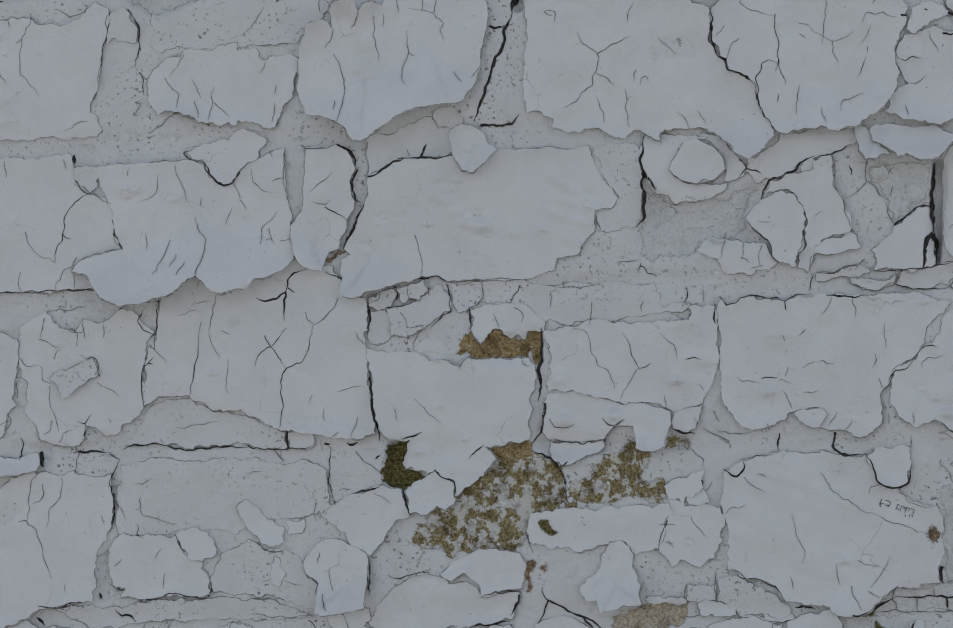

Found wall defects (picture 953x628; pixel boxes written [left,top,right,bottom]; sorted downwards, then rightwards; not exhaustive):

crack [454,0,519,127]
crack [568,6,715,227]
crack [709,0,953,127]
peeling [147,0,953,467]
crack [676,144,953,322]
crack [0,144,451,628]
peeling [0,129,543,628]
crack [447,587,601,628]
crack [664,396,780,513]
peeling [527,444,953,628]
crack [821,415,929,532]
crack [837,560,953,628]